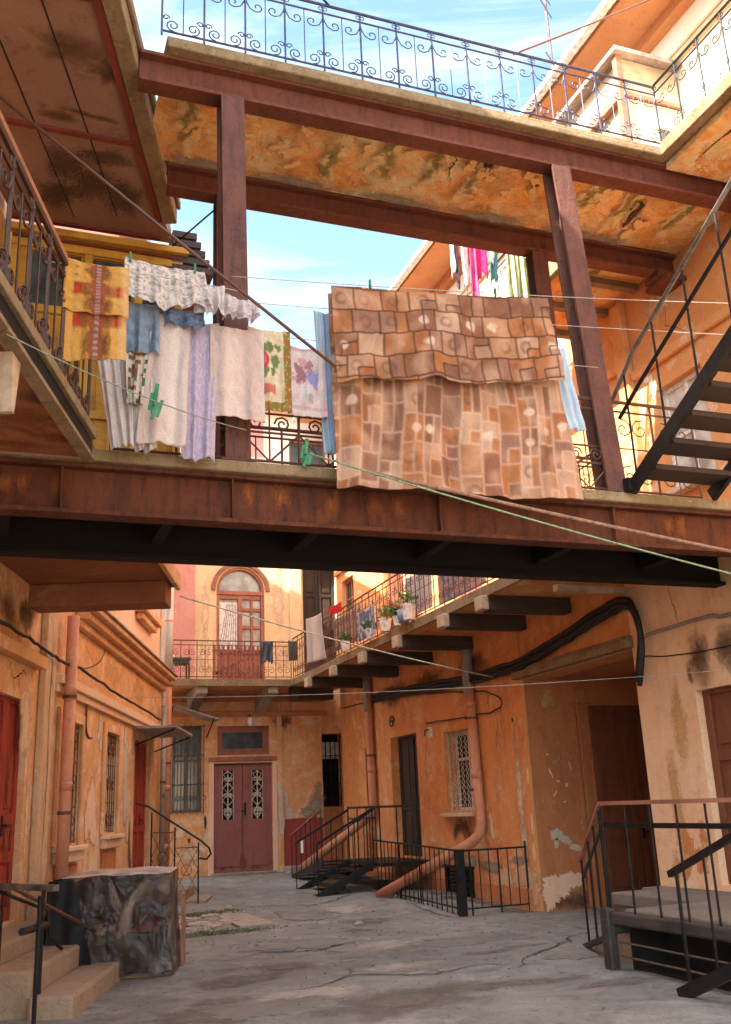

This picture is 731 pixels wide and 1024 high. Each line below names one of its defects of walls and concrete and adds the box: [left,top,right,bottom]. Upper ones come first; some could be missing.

leakage [44,110,112,122]
leakage [41,146,142,215]
leakage [688,632,731,680]
leakage [669,695,686,840]
spalling [495,815,587,912]